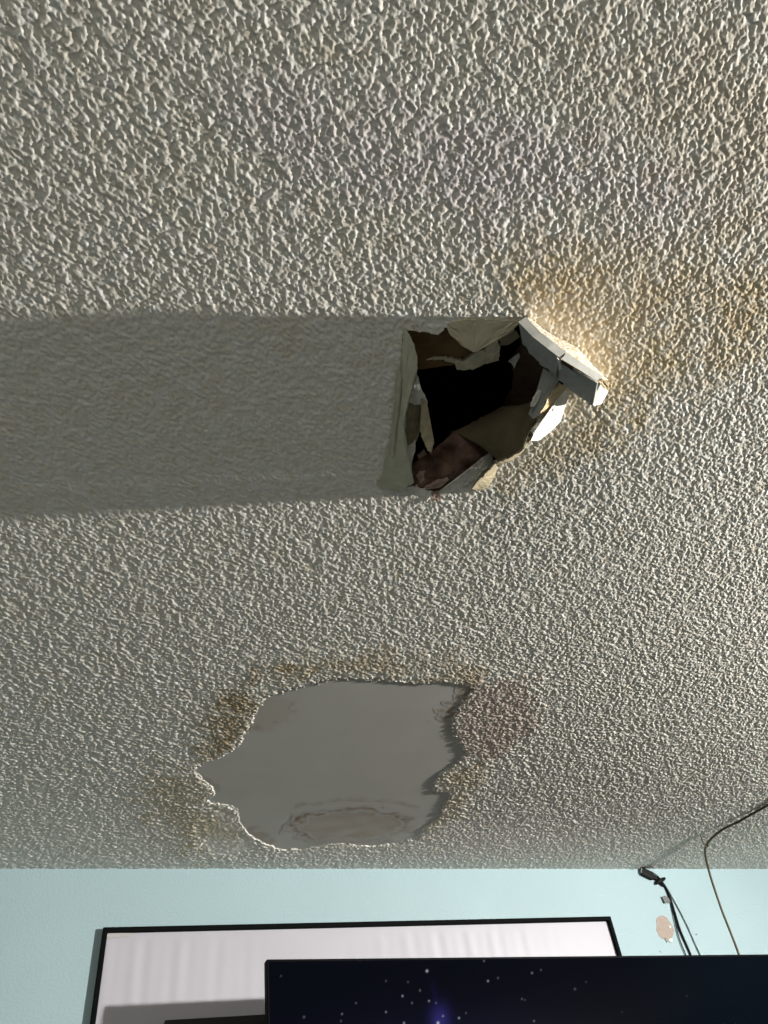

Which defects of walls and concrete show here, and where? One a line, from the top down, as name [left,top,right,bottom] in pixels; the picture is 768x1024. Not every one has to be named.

water stain [100,632,563,862]